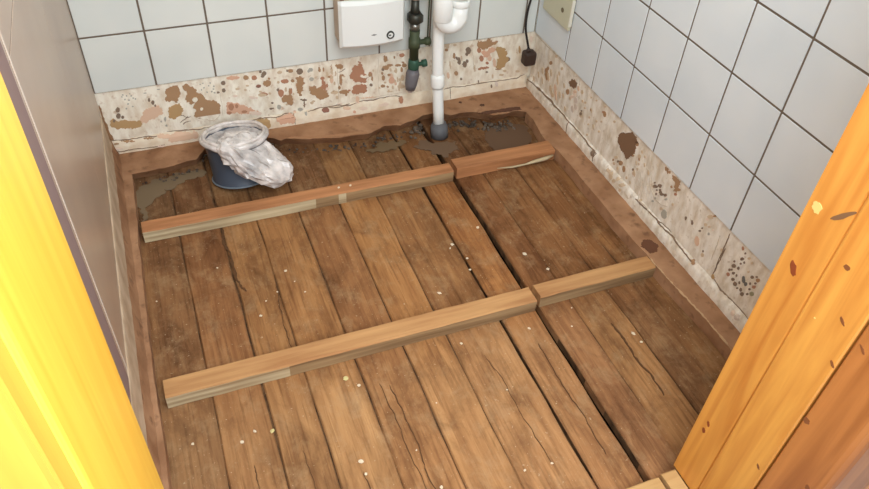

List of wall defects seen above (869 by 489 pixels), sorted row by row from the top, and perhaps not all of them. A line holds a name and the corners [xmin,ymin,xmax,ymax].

spalling [110,107,142,130]
spalling [148,81,226,121]
spalling [243,64,349,110]
flaking render [368,55,407,88]
damp [366,140,460,158]
spalling [445,38,510,84]
damp [484,123,532,151]
spalling [612,132,640,172]
damp [136,169,207,222]
spalling [653,167,681,197]
crack [635,158,748,319]
flaking render [728,252,760,296]